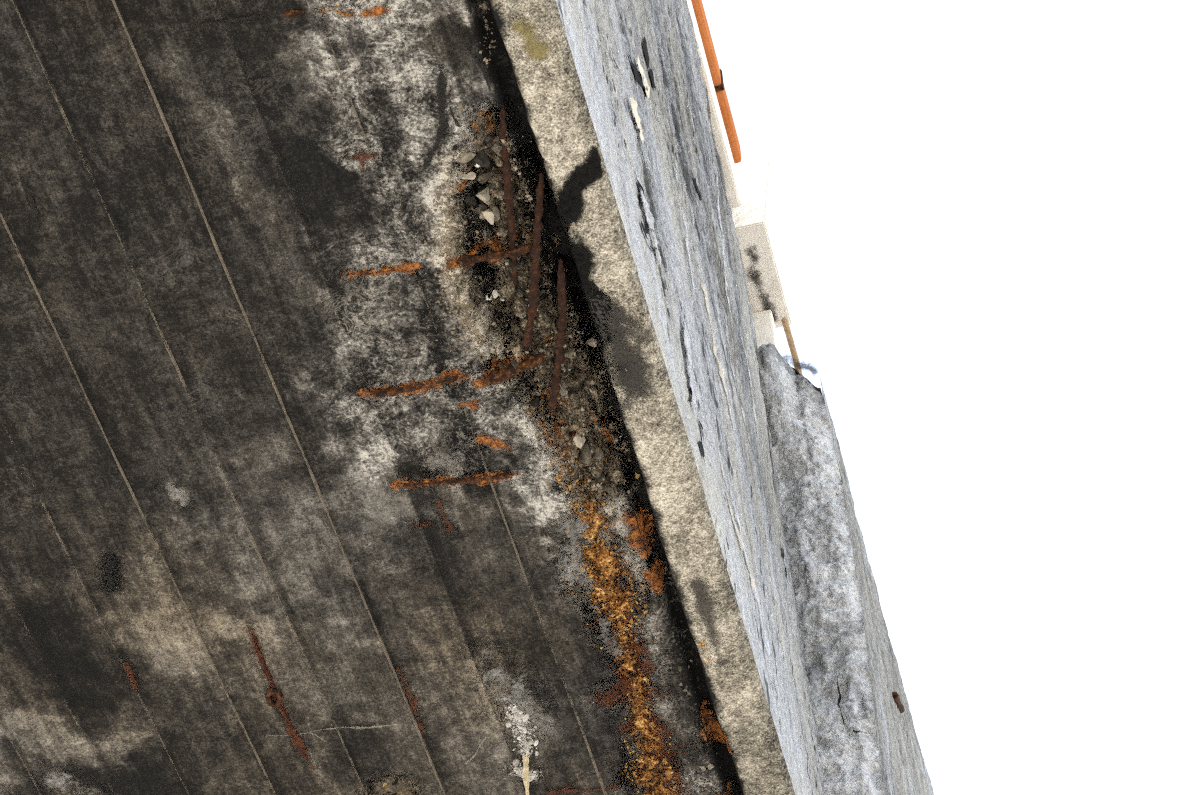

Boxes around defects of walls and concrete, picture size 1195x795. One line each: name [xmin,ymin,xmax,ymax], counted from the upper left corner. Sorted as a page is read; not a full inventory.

spalling [479,1,496,67]
rust [347,263,422,278]
rust [445,227,533,269]
rust [358,337,552,409]
leakage [584,295,657,410]
rust [391,472,513,490]
spalling [369,103,729,795]
rust [527,387,664,593]
rust [246,629,315,769]
leakage [482,664,552,782]
rust [580,557,686,795]